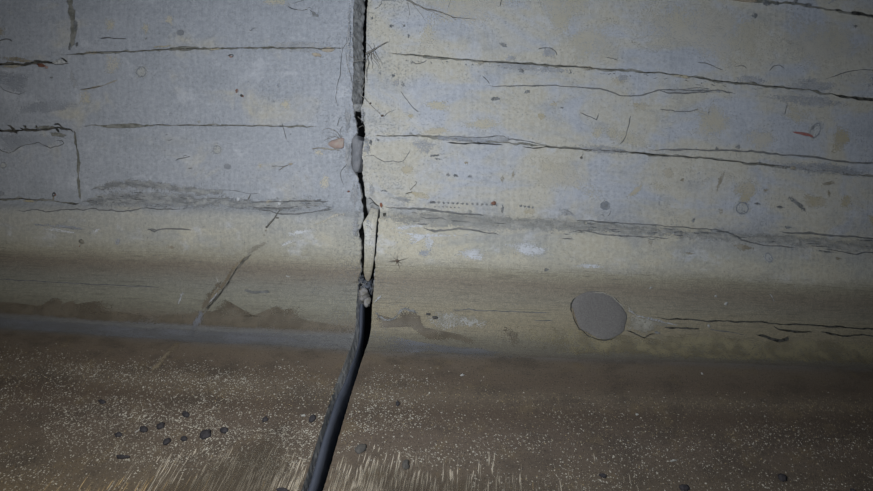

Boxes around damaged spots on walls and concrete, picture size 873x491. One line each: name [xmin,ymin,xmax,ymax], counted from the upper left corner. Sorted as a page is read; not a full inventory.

crack [335,38,347,126]
crack [484,62,746,144]
crack [657,317,873,342]